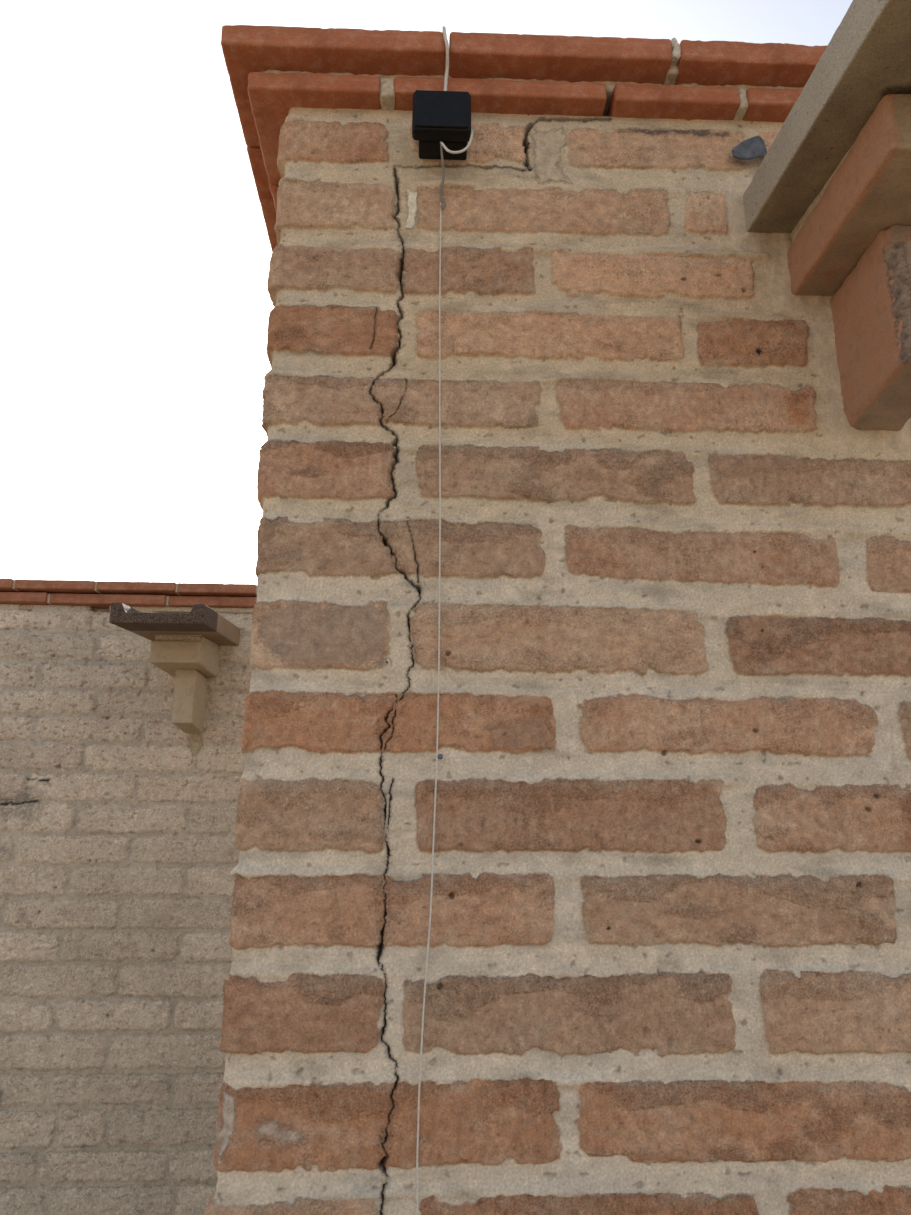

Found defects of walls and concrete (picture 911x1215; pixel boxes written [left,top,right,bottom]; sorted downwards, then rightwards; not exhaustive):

leakage [883,86,911,96]
crack [367,116,613,1215]